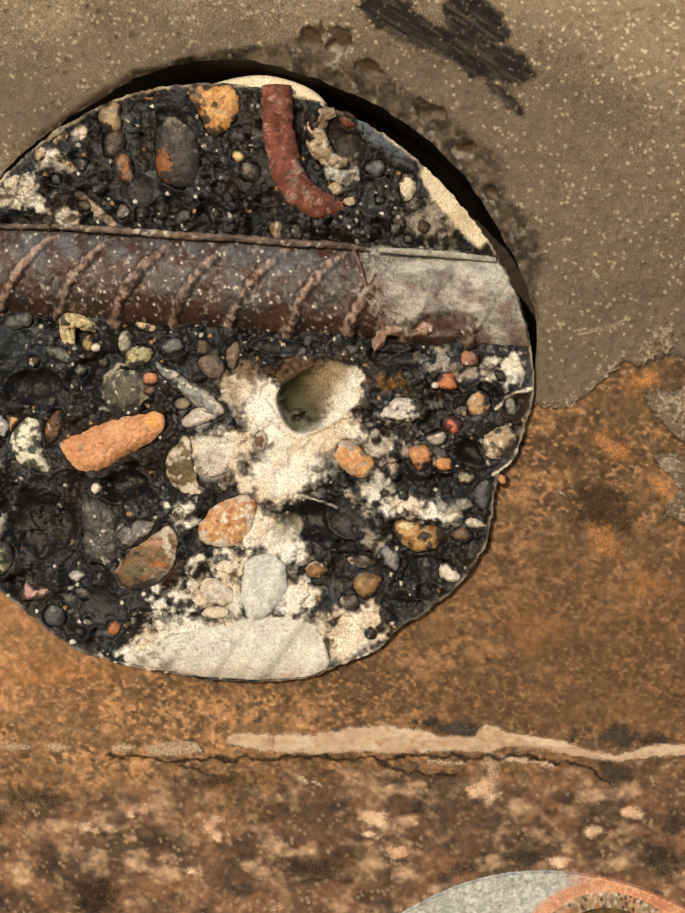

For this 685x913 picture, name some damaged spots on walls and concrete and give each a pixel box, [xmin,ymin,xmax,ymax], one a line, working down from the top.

spalling [165,20,544,316]
damp [0,0,685,409]
rust [371,315,402,352]
rust [415,322,434,336]
peeling [540,320,676,410]
peeling [642,386,685,443]
damp [643,387,685,443]
damp [563,484,633,533]
peeling [658,453,685,521]
rust [0,357,685,913]